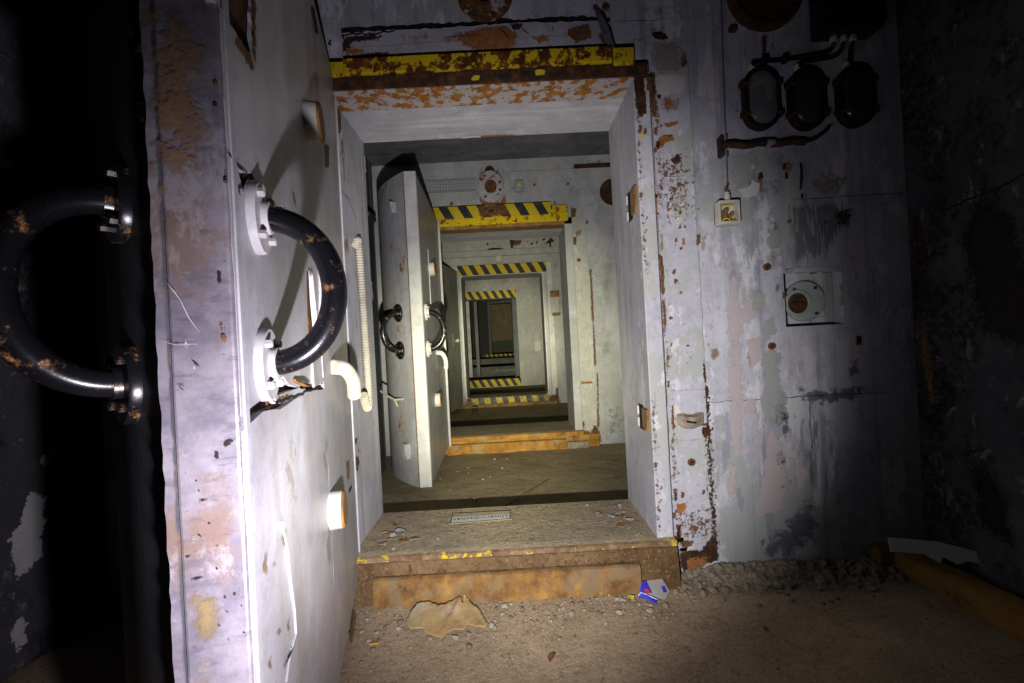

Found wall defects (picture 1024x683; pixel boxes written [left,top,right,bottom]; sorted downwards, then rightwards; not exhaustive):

rust [567,24,611,46]
rust [633,73,720,572]
peeling [726,250,796,518]
damp [800,361,861,484]
peeling [7,492,48,580]
damp [761,505,819,557]
peeling [10,617,29,653]